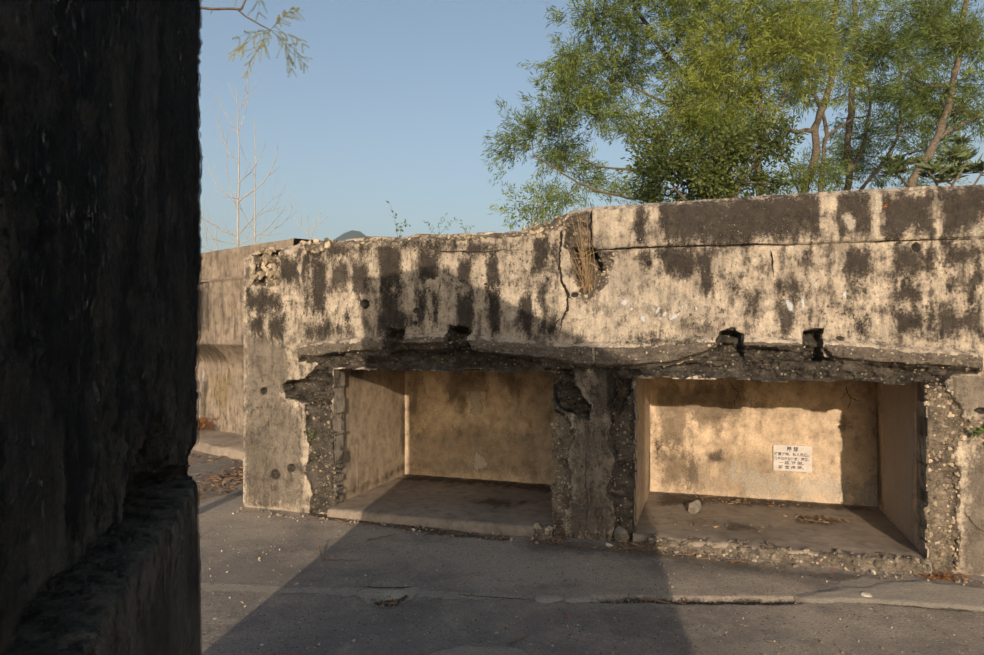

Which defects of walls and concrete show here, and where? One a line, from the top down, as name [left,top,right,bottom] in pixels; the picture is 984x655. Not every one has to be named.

damp [156,0,226,363]
spalling [250,247,281,287]
damp [279,236,502,341]
crack [440,222,572,335]
damp [518,237,559,341]
crack [588,210,796,277]
damp [633,193,827,298]
damp [775,277,804,340]
damp [836,184,984,343]
damp [243,286,301,509]
spalling [271,307,984,577]
damp [116,480,202,655]